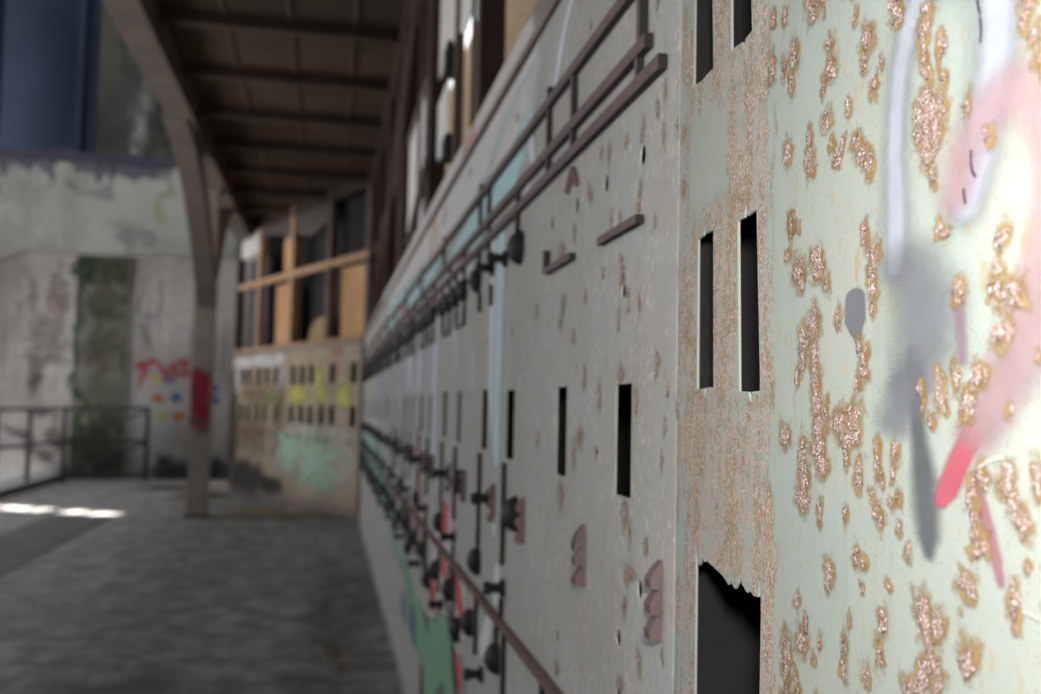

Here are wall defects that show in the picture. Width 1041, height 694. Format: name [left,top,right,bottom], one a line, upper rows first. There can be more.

leakage [0,95,173,200]
corrosion [912,0,971,191]
corrosion [934,215,952,242]
corrosion [950,275,966,309]
corrosion [625,0,912,694]